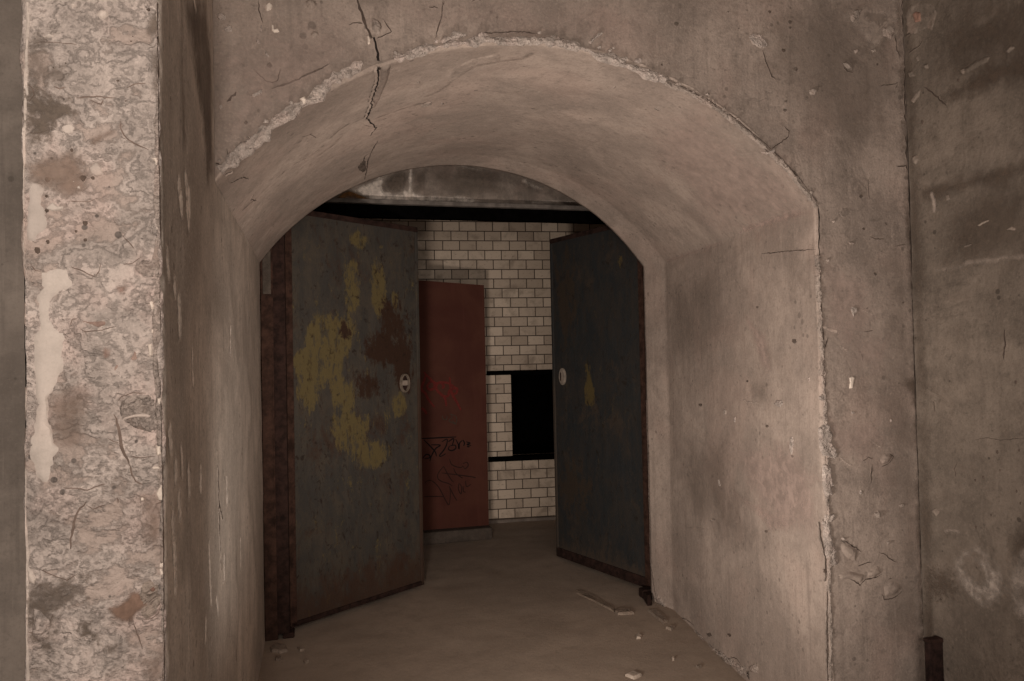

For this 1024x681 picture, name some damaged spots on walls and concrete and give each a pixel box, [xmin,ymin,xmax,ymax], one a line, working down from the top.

spalling [216,60,363,175]
crack [349,0,392,180]
spalling [393,28,819,208]
flaking render [22,2,116,681]
spalling [808,256,850,681]